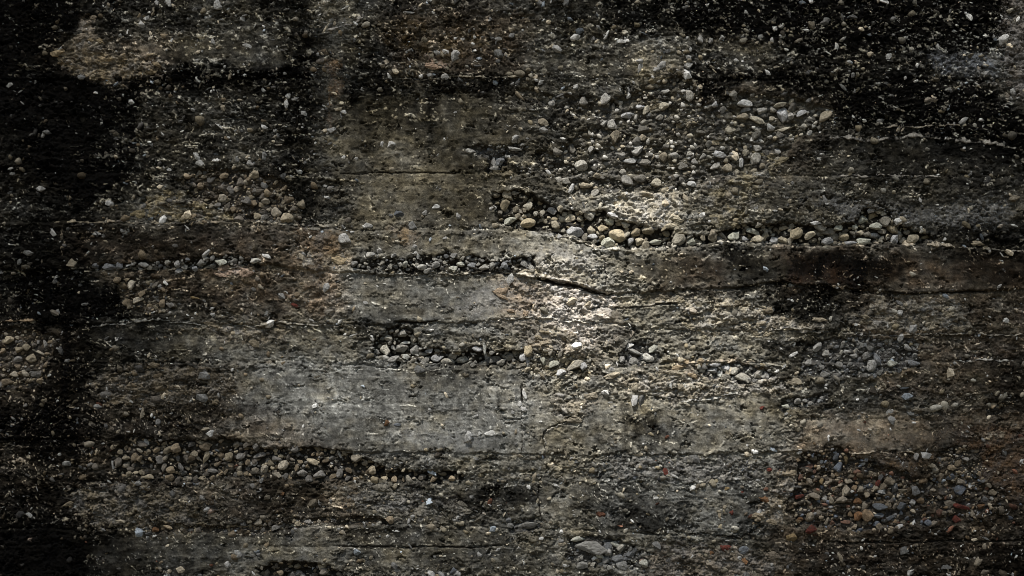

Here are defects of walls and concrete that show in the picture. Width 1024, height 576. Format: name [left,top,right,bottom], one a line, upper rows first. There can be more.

crack [536,251,675,309]
water stain [0,263,132,479]
water stain [0,525,85,576]